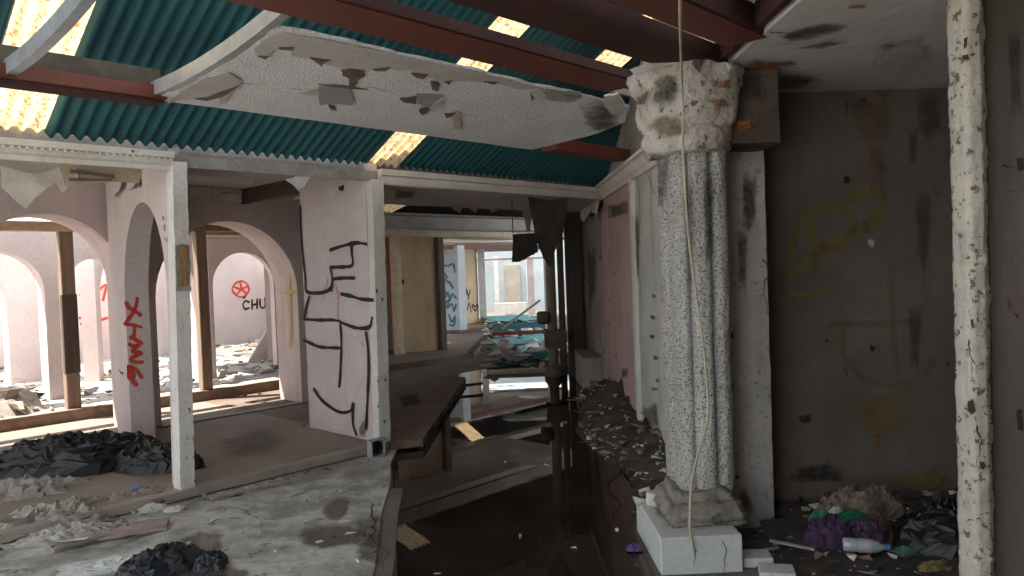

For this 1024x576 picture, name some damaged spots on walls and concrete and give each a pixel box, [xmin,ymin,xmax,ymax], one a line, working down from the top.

leakage [785,25,840,49]
flaking render [254,33,582,129]
flaking render [604,92,625,115]
flaking render [630,62,677,77]
leakage [636,76,675,105]
leakage [652,120,682,134]
flaking render [0,166,79,209]
leakage [743,183,755,226]
leakage [299,499,378,561]